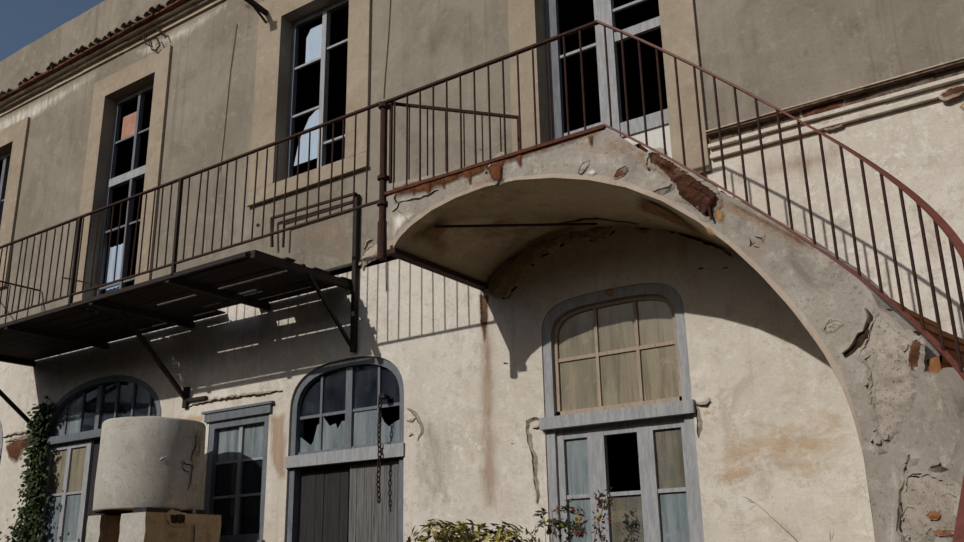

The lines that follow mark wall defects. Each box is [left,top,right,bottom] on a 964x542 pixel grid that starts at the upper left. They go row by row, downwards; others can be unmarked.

spalling [938,85,964,111]
corrosion [394,154,521,195]
spalling [577,159,595,175]
spalling [612,164,629,180]
spalling [646,147,723,222]
spalling [841,308,926,455]
crack [525,417,540,504]
spalling [897,448,961,542]